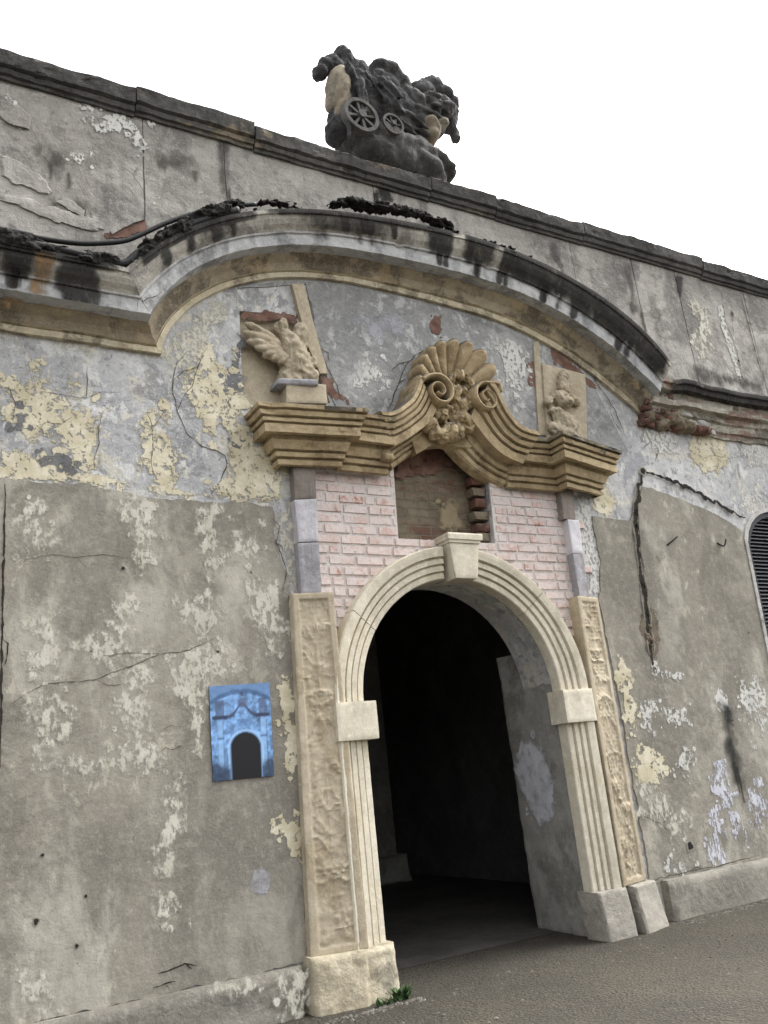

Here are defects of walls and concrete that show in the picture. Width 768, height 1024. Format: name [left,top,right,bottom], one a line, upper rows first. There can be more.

peeling [79,103,156,157]
damp [0,243,117,305]
damp [269,208,669,375]
peeling [687,298,741,379]
crack [146,351,234,498]
spalling [624,382,768,484]
crack [0,484,213,768]
peeling [0,302,298,932]
crack [632,442,745,666]
peeling [614,609,768,876]
damp [724,706,745,802]
peeling [270,808,303,865]